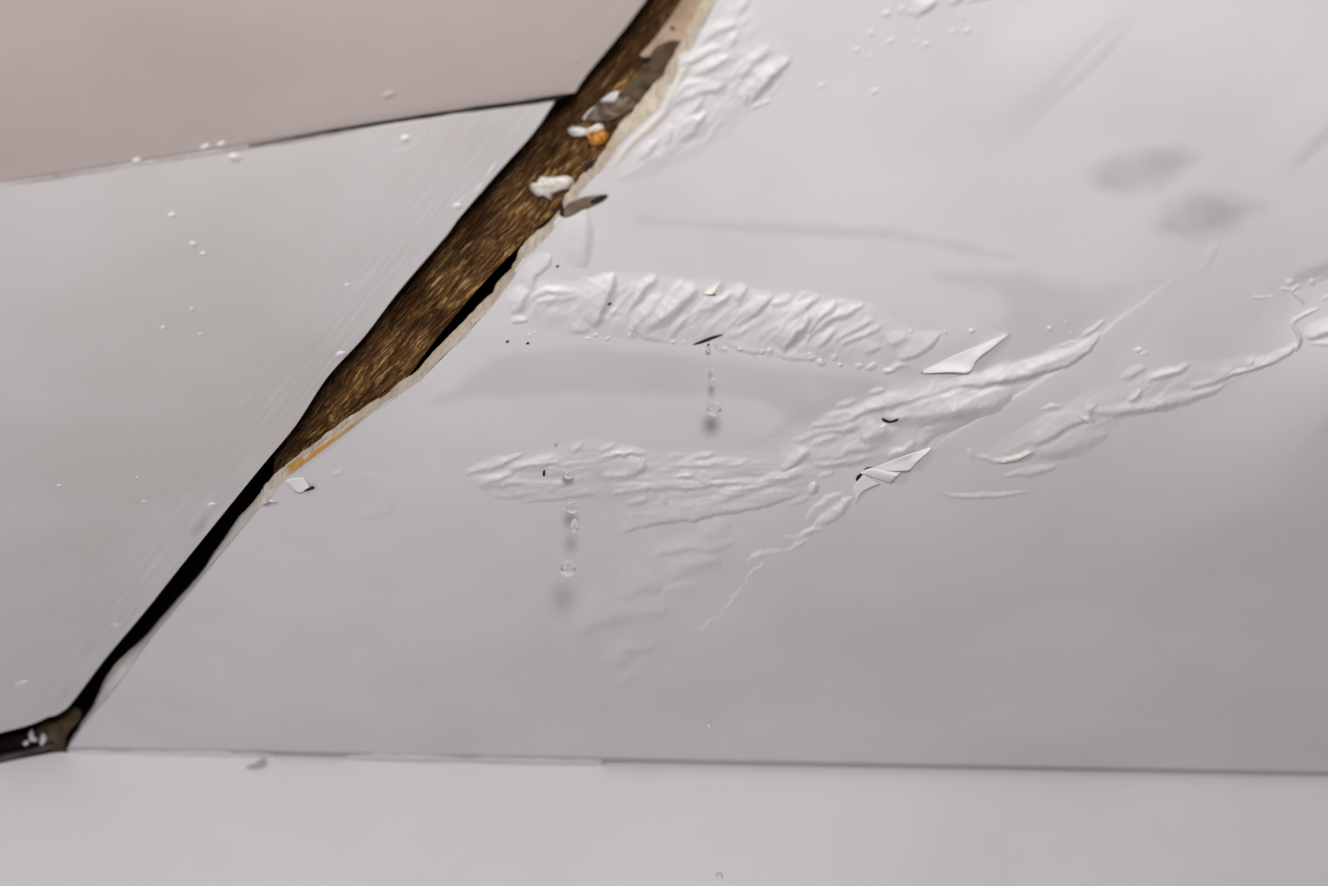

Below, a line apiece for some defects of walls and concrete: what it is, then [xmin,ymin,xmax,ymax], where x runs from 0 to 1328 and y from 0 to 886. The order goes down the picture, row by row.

peeling [882,0,988,49]
crack [248,92,573,154]
peeling [778,319,1106,528]